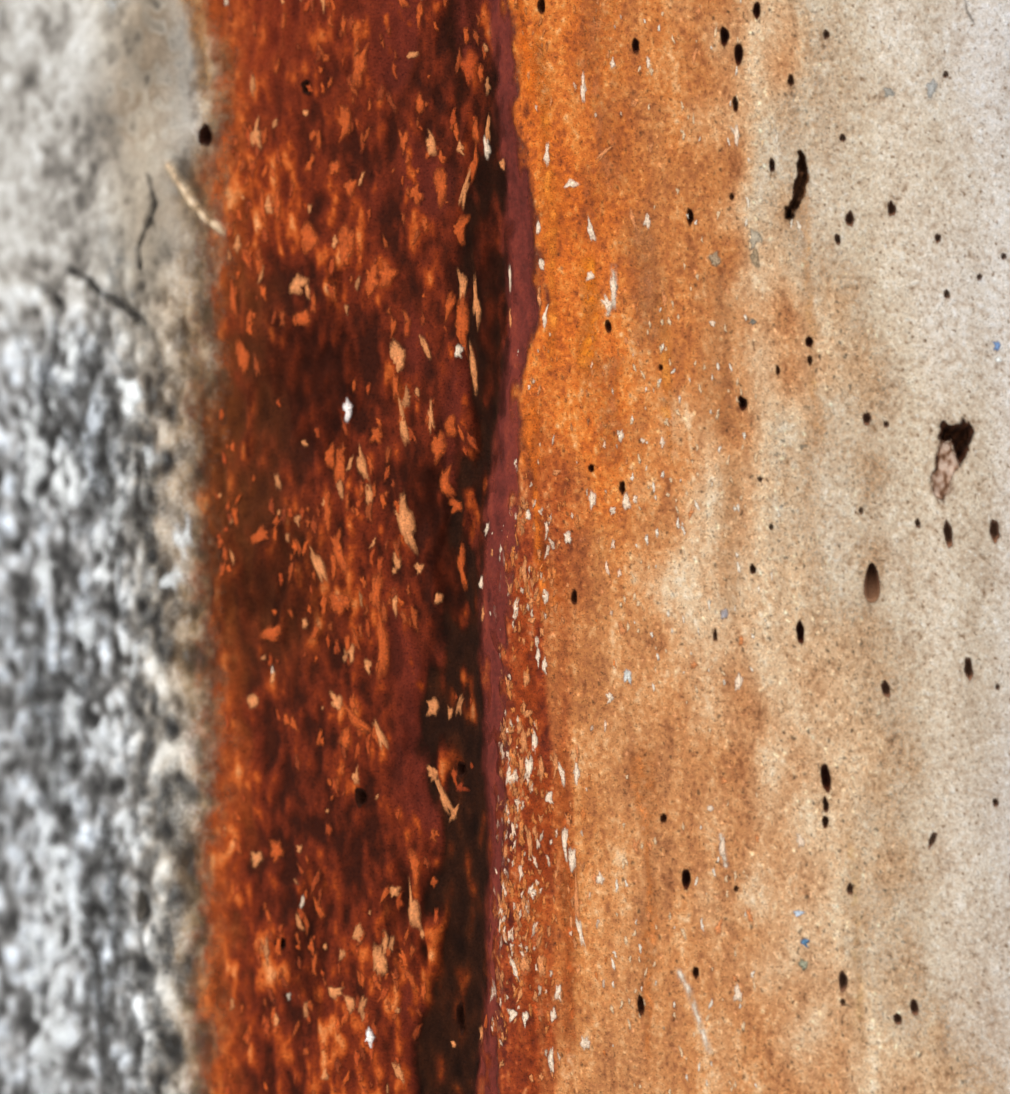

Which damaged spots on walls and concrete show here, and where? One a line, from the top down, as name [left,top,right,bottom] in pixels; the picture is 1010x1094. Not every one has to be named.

rust [152,0,513,1094]
rust [489,0,1004,1094]